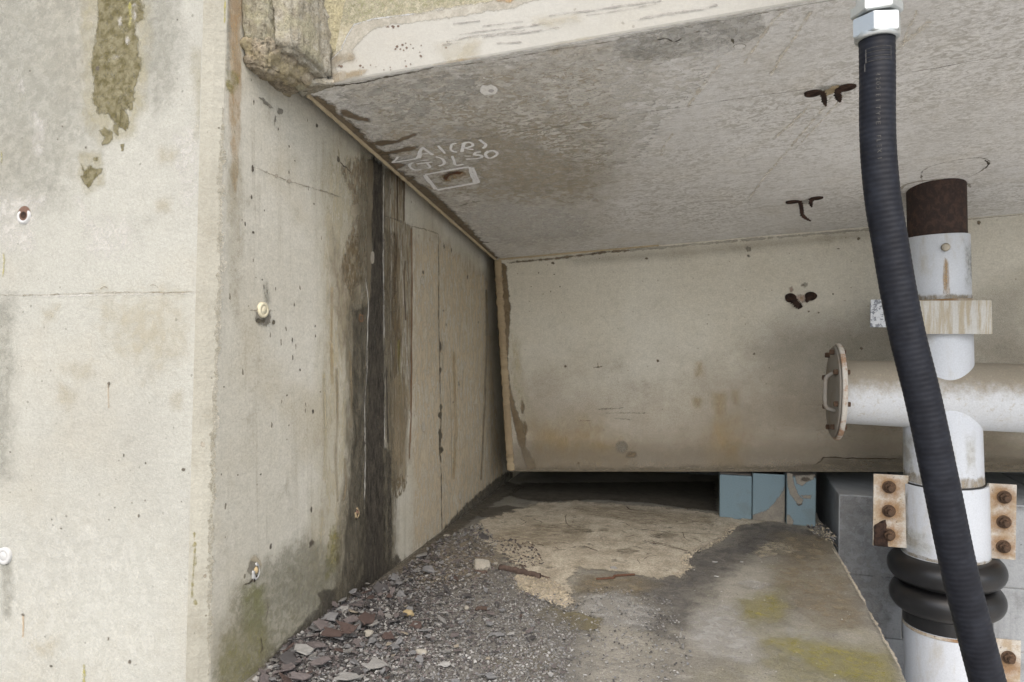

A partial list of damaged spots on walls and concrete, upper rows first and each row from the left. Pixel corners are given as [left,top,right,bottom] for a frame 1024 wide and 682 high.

peeling [99,102,133,151]
water stain [264,50,903,666]
water stain [984,440,1024,472]